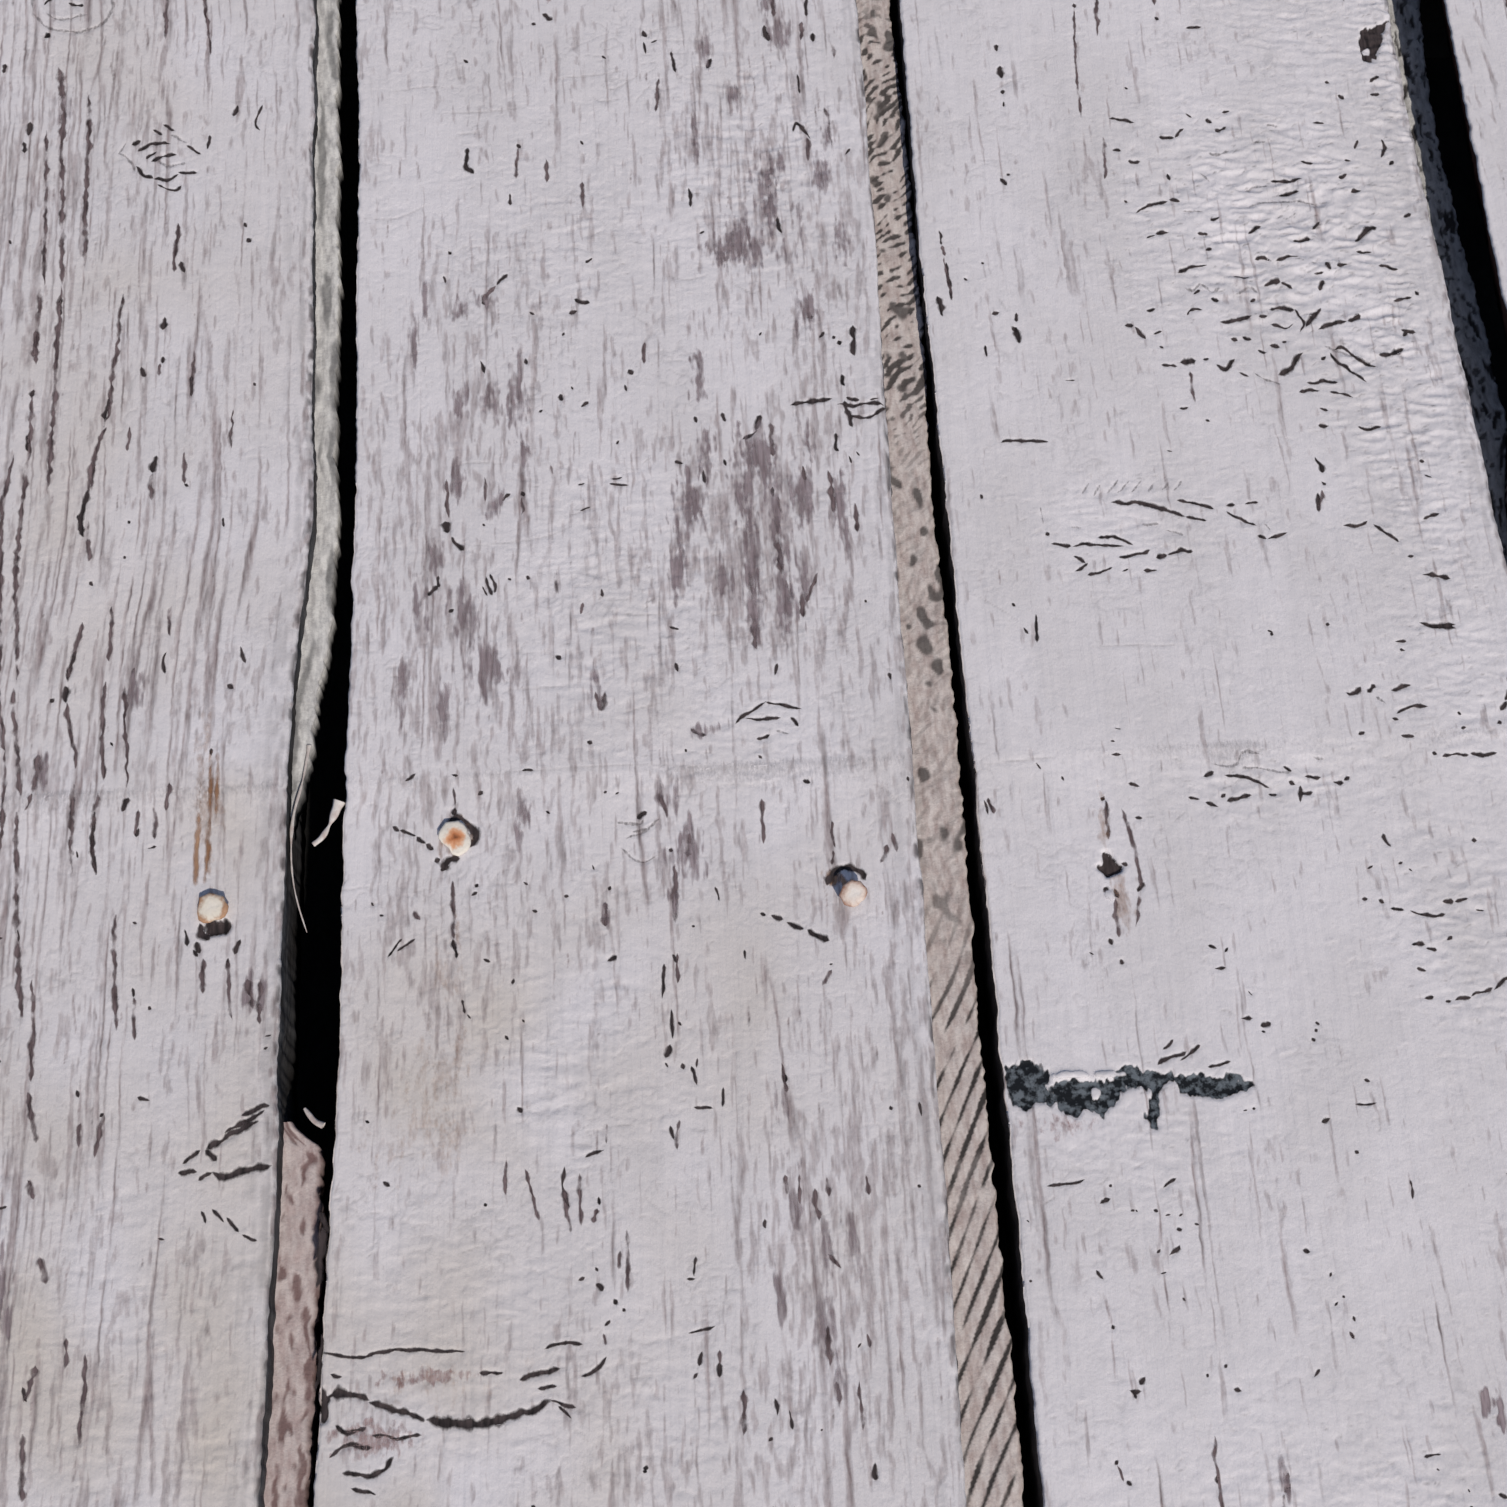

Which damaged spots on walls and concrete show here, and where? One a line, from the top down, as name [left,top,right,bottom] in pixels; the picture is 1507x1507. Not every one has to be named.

corrosion [193,767,219,882]
corrosion [205,919,231,937]
spalling [1005,1040,1254,1130]
crack [314,1141,630,1495]